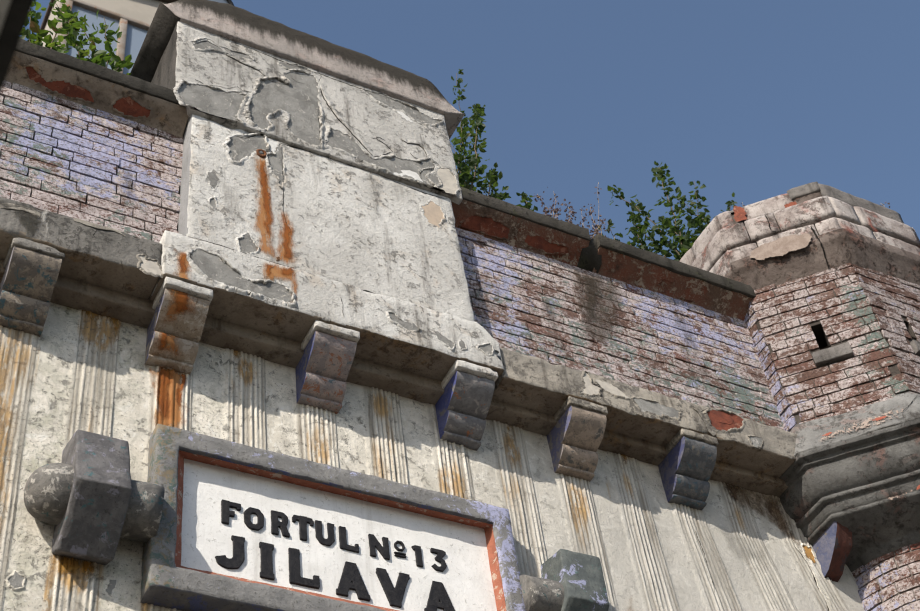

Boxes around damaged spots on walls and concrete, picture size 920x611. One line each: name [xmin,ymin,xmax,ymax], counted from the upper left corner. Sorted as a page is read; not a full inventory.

peeling [23,63,96,104]
peeling [110,94,153,120]
crack [188,37,441,223]
peeling [173,61,461,230]
peeling [185,246,298,308]
peeling [235,231,261,256]
rust [256,157,297,293]
peeling [458,213,512,242]
water stain [575,271,620,341]
flaking render [749,233,812,260]
rust [150,367,186,428]
spalling [703,407,765,449]